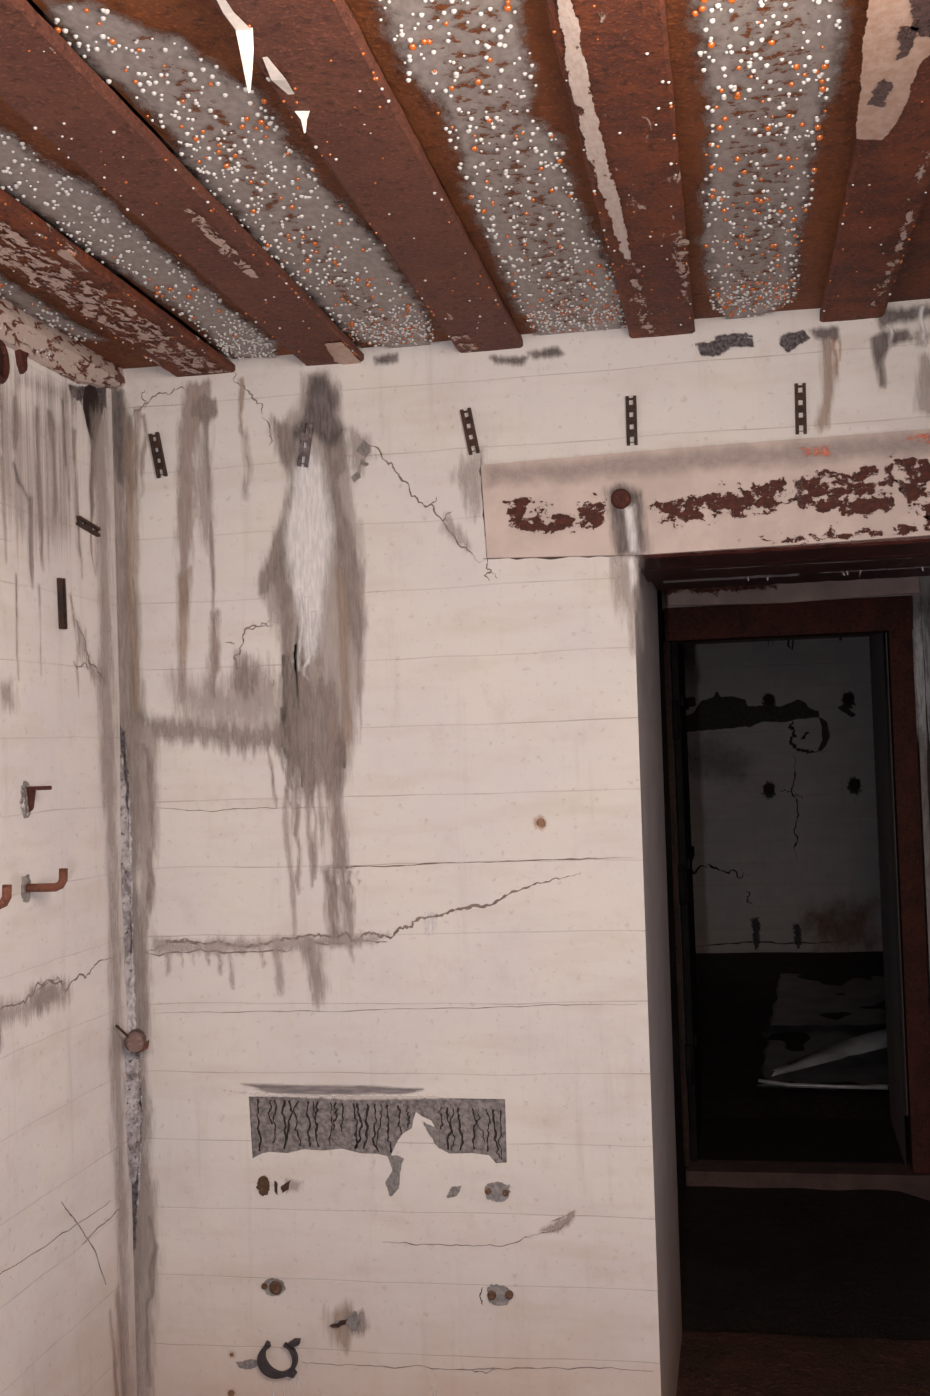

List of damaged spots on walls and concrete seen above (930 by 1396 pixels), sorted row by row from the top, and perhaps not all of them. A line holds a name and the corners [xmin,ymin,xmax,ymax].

corrosion [895,0,930,60]
corrosion [425,1,589,324]
corrosion [0,340,10,384]
water stain [872,306,930,412]
water stain [16,401,76,616]
corrosion [502,493,607,534]
corrosion [649,453,930,545]
crack [3,688,11,703]
water stain [94,376,363,1396]
crack [0,857,636,1045]
flaking render [249,1097,507,1196]
crack [0,1201,120,1284]